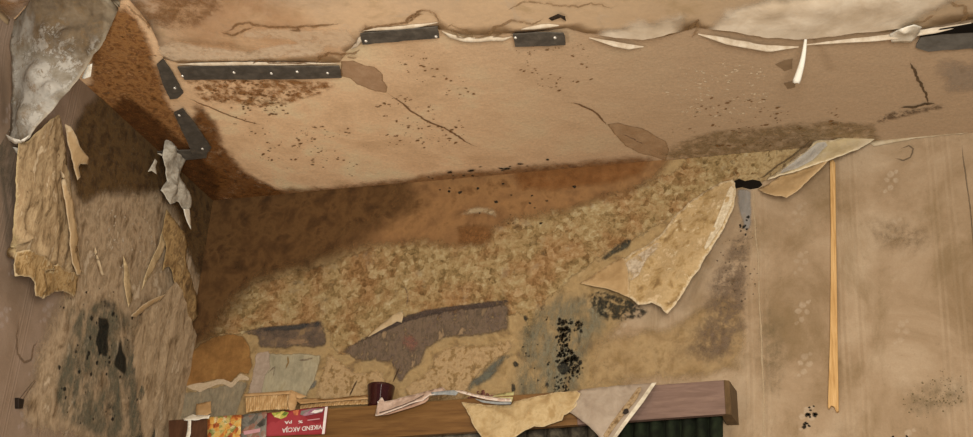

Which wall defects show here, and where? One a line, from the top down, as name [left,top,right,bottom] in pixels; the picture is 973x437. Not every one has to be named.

damp [111,0,216,29]
crack [393,97,474,146]
crack [901,63,934,108]
damp [70,96,874,357]
peeling [180,123,800,420]
damp [58,291,155,437]
damp [471,292,646,395]